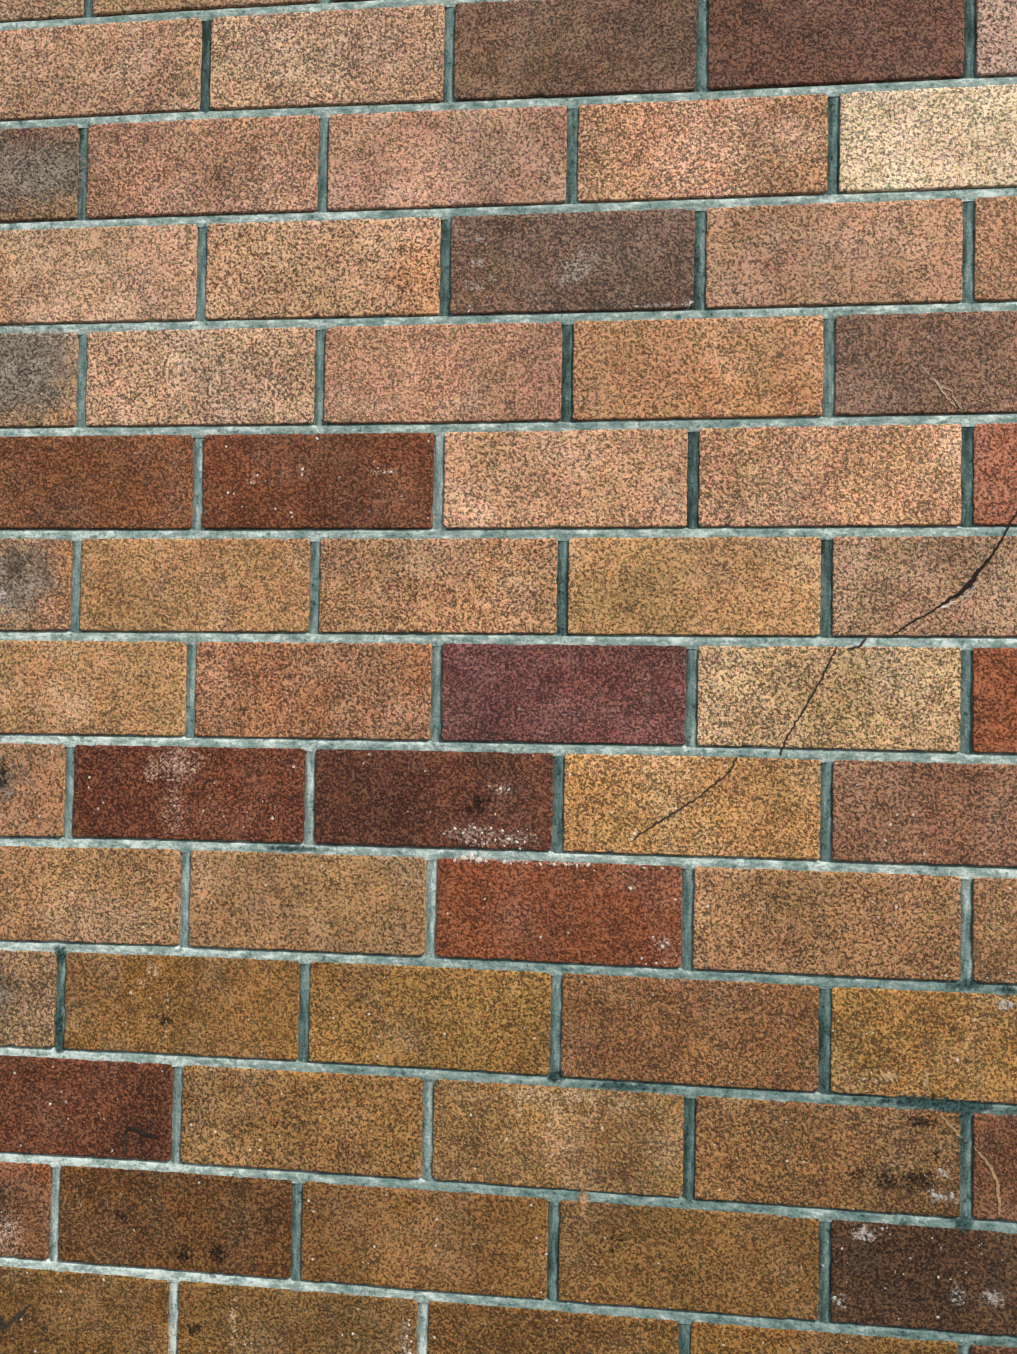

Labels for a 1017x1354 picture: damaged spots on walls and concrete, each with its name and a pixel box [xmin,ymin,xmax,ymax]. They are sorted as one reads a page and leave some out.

crack [780,510,1017,756]
crack [630,757,738,841]